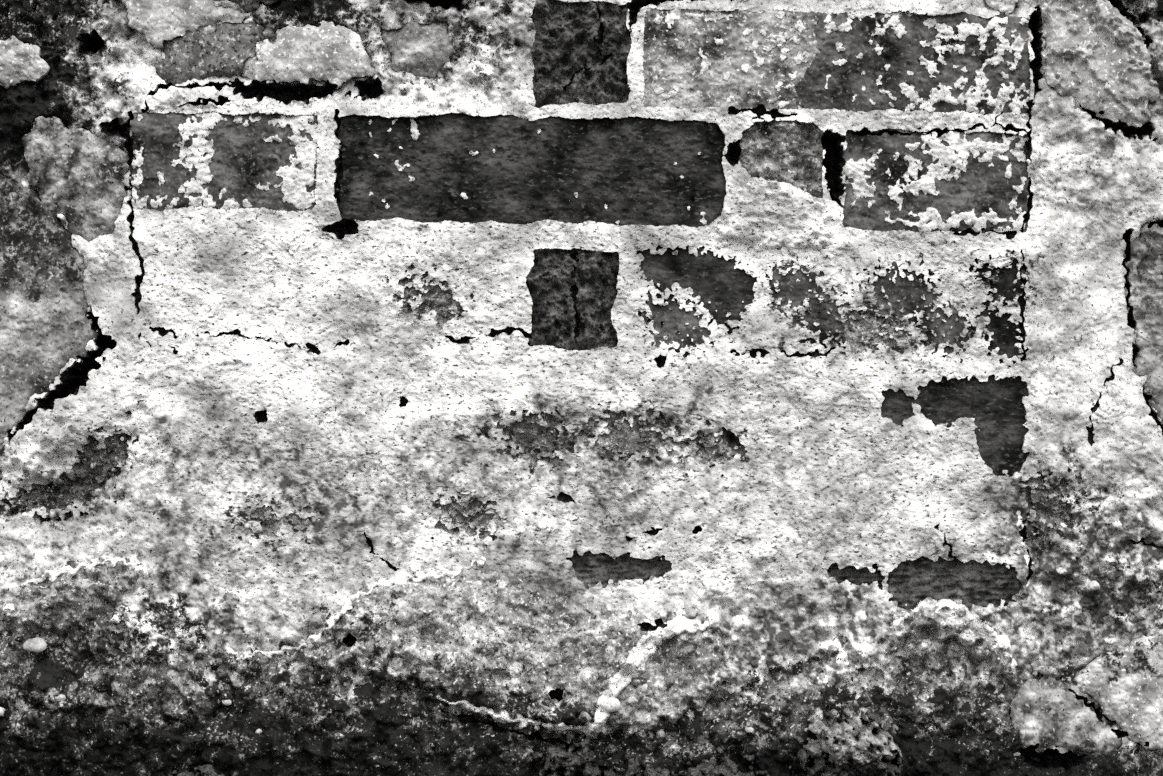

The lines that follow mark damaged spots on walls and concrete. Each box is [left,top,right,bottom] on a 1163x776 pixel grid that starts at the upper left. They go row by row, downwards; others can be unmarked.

peeling [653,9,733,29]
peeling [698,48,711,74]
peeling [723,10,807,109]
peeling [824,11,1030,115]
peeling [129,111,318,211]
peeling [387,118,420,181]
peeling [821,129,1029,234]
crack [1086,219,1163,446]
flaking render [636,243,1090,559]
flaking render [566,550,672,589]
flaking render [820,556,1022,612]
crack [1129,537,1163,549]